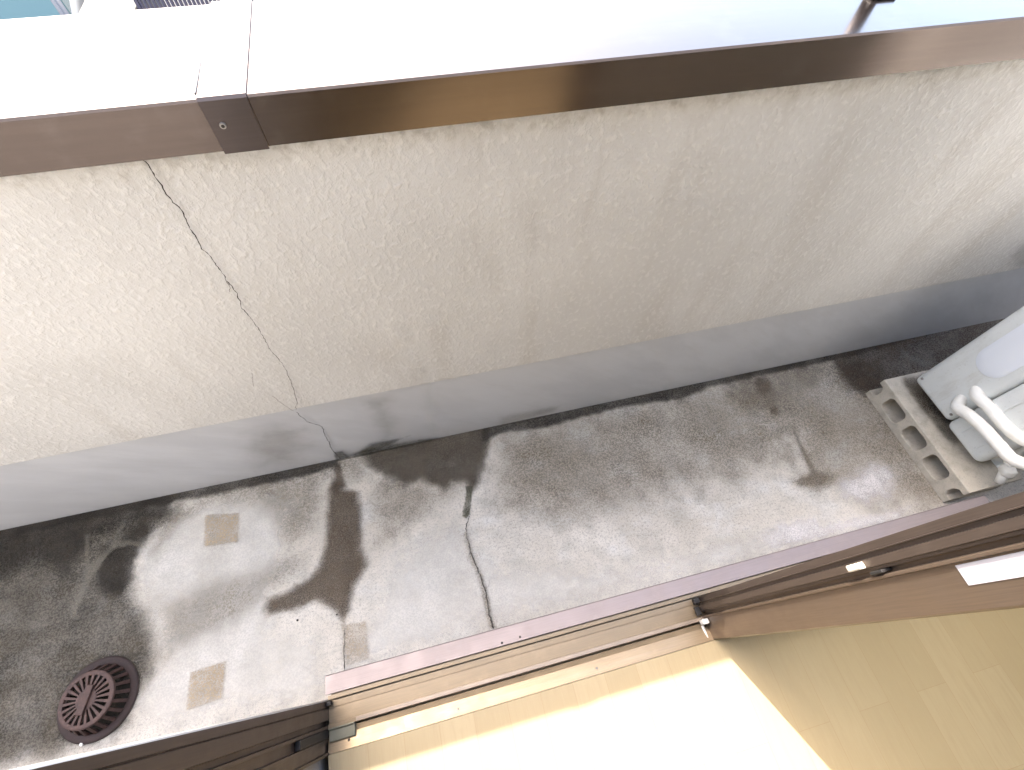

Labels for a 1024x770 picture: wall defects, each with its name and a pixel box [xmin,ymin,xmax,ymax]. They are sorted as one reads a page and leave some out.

water stain [0,459,364,763]
crack [144,161,342,460]
crack [465,516,495,629]
water stain [361,318,1005,533]